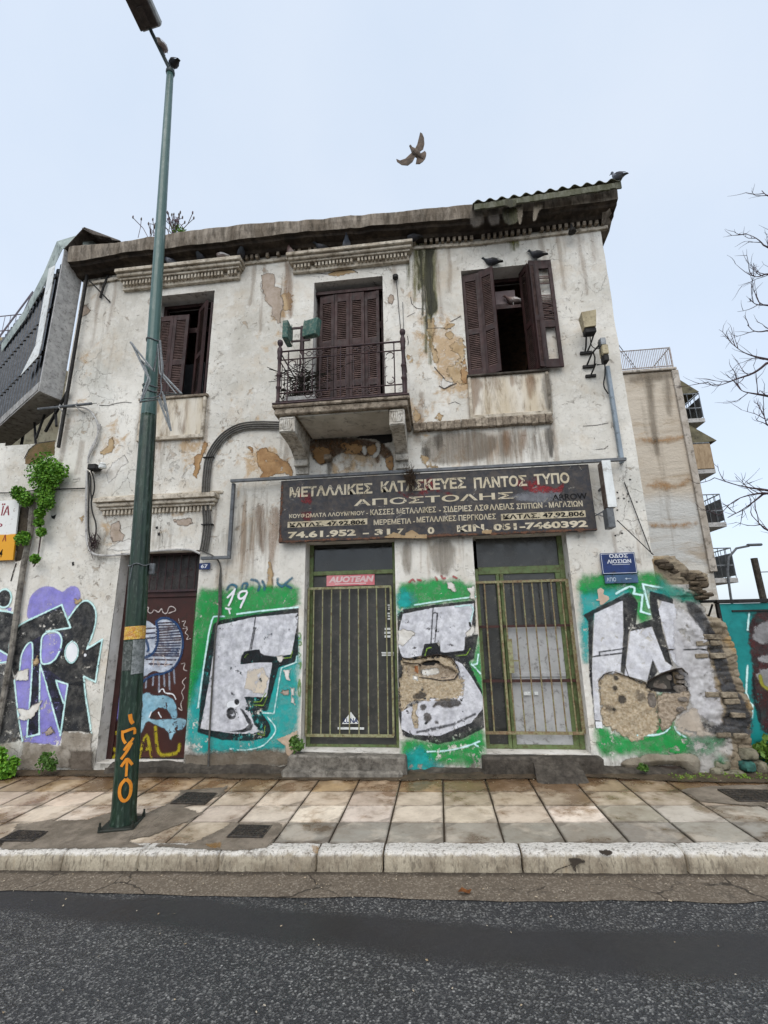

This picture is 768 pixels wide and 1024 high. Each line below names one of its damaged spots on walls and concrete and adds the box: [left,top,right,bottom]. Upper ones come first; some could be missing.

flaking render [260,273,284,324]
water stain [415,242,438,317]
flaking render [427,323,468,389]
flaking render [100,437,129,482]
flaking render [193,441,208,479]
flaking render [247,446,293,478]
flaking render [447,582,475,600]
flaking render [397,629,465,729]
flaking render [598,668,691,742]